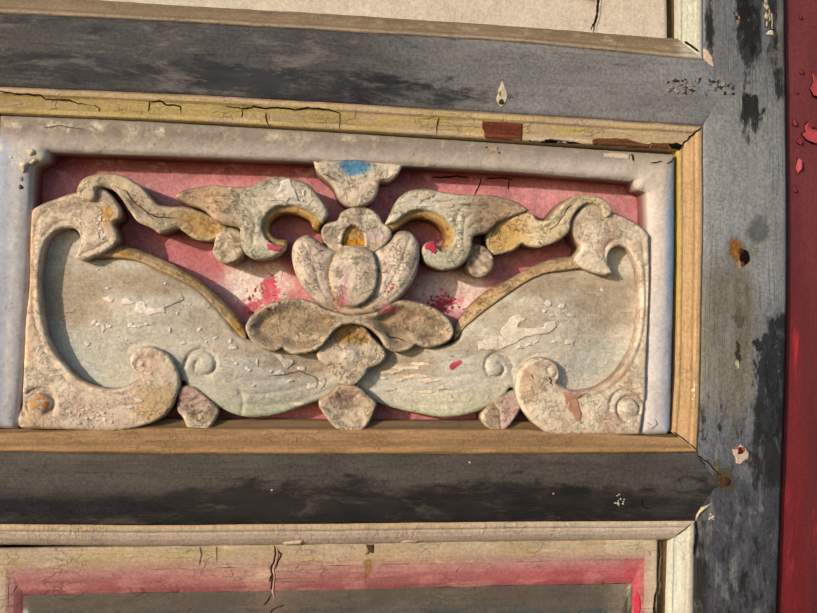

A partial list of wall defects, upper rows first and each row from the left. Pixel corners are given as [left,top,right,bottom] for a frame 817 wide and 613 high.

crack [591,0,601,33]
crack [148,100,181,113]
crack [226,106,340,129]
peeling [665,78,765,123]
peeling [792,118,817,145]
corrosion [729,239,756,269]
peeling [478,300,576,351]
peeling [564,392,587,421]
peeling [732,445,749,464]
crack [677,521,699,555]
crack [264,545,284,613]
crack [652,546,662,613]